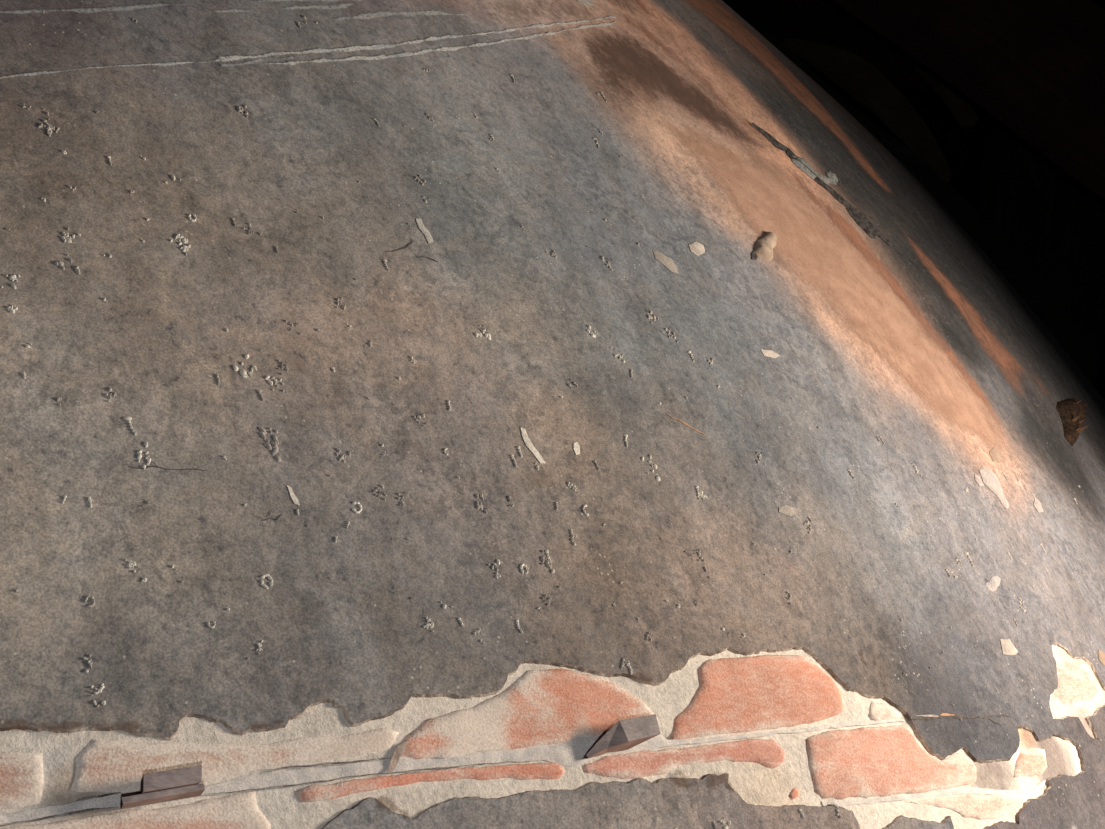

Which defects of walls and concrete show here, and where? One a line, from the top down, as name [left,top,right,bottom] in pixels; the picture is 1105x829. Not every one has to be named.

corrosion [686,0,889,191]
corrosion [674,127,1002,447]
corrosion [909,239,1021,387]
spalling [0,647,1085,829]
spalling [1000,639,1018,655]
spalling [1049,643,1105,740]